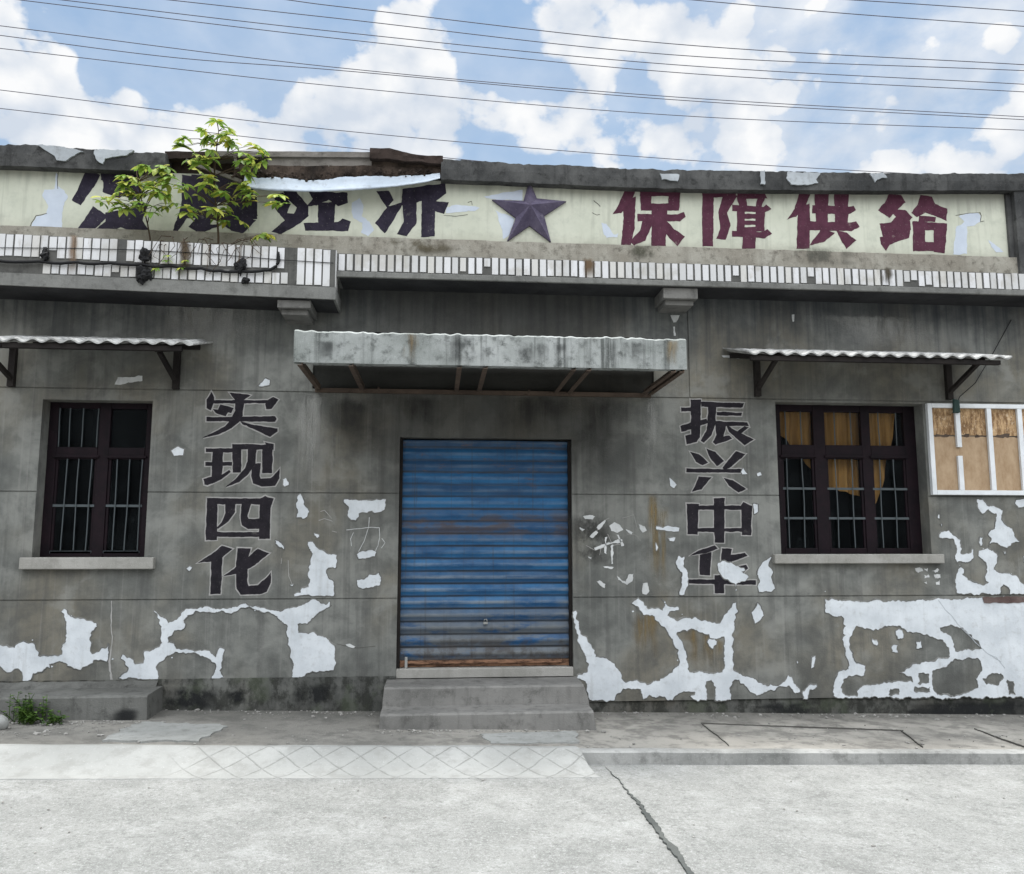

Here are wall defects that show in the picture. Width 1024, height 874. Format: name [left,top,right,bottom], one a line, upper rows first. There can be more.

spalling [38,144,135,164]
peeling [170,446,185,457]
peeling [282,477,310,520]
peeling [343,498,387,522]
peeling [356,548,377,560]
peeling [356,571,382,590]
peeling [0,532,355,681]
peeling [572,515,818,703]
peeling [824,498,1024,700]